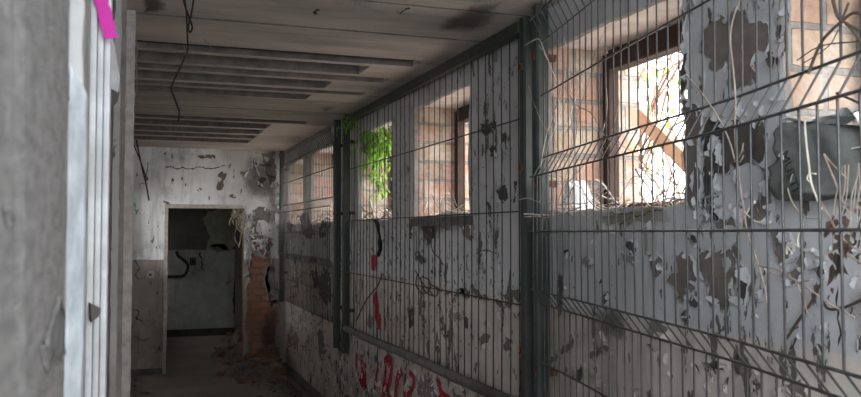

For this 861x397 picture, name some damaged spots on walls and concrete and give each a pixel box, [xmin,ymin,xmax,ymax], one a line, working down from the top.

crack [139,162,227,186]
flaking render [202,151,331,355]
peeling [356,57,521,362]
peeling [619,0,839,322]
peeling [690,353,759,394]